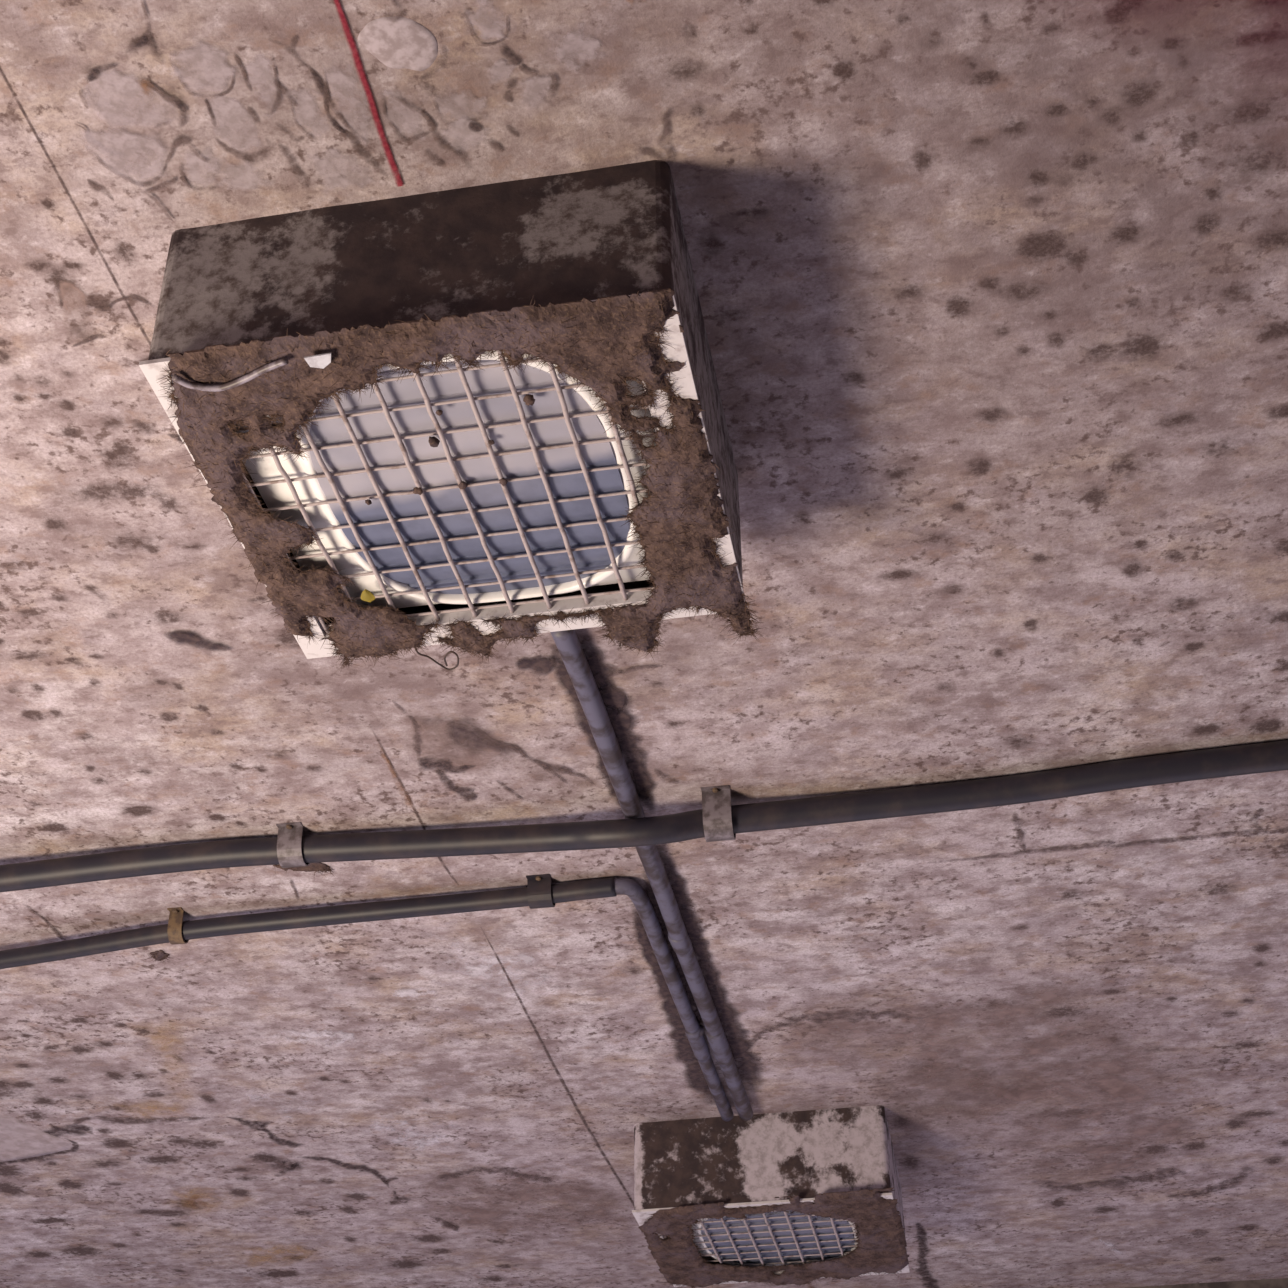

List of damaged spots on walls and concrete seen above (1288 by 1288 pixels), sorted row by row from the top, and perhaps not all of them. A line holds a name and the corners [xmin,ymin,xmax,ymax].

crack [274,37,370,158]
crack [281,138,302,176]
crack [401,100,462,165]
crack [641,111,673,163]
crack [984,811,1288,858]
crack [232,1118,408,1204]